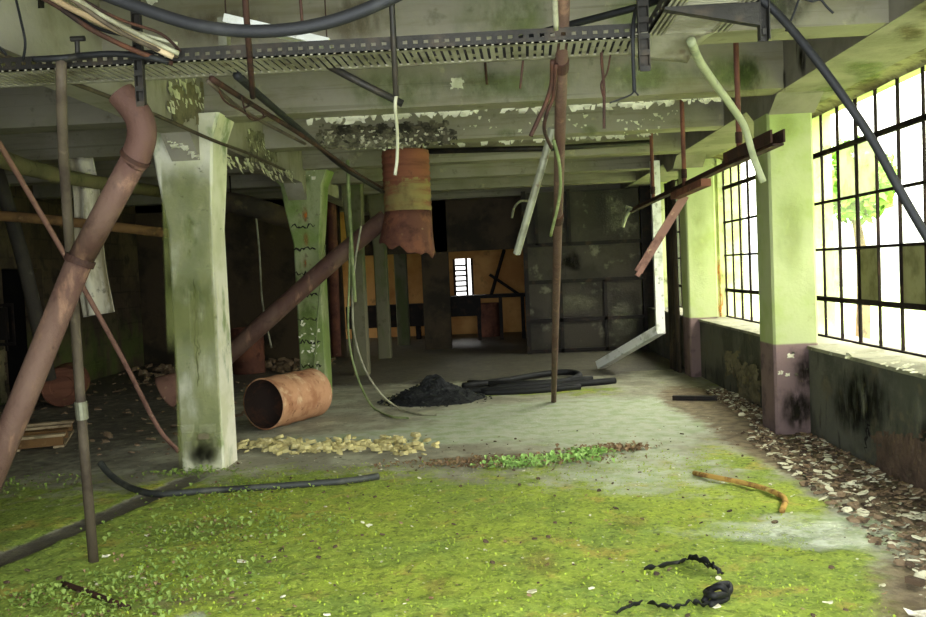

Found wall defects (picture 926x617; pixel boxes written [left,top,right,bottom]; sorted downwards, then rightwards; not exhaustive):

peeling [167,78,204,125]
spalling [306,109,497,151]
peeling [499,106,546,145]
peeling [567,97,722,141]
peeling [227,128,296,184]
damp [163,177,221,454]
damp [838,374,883,429]